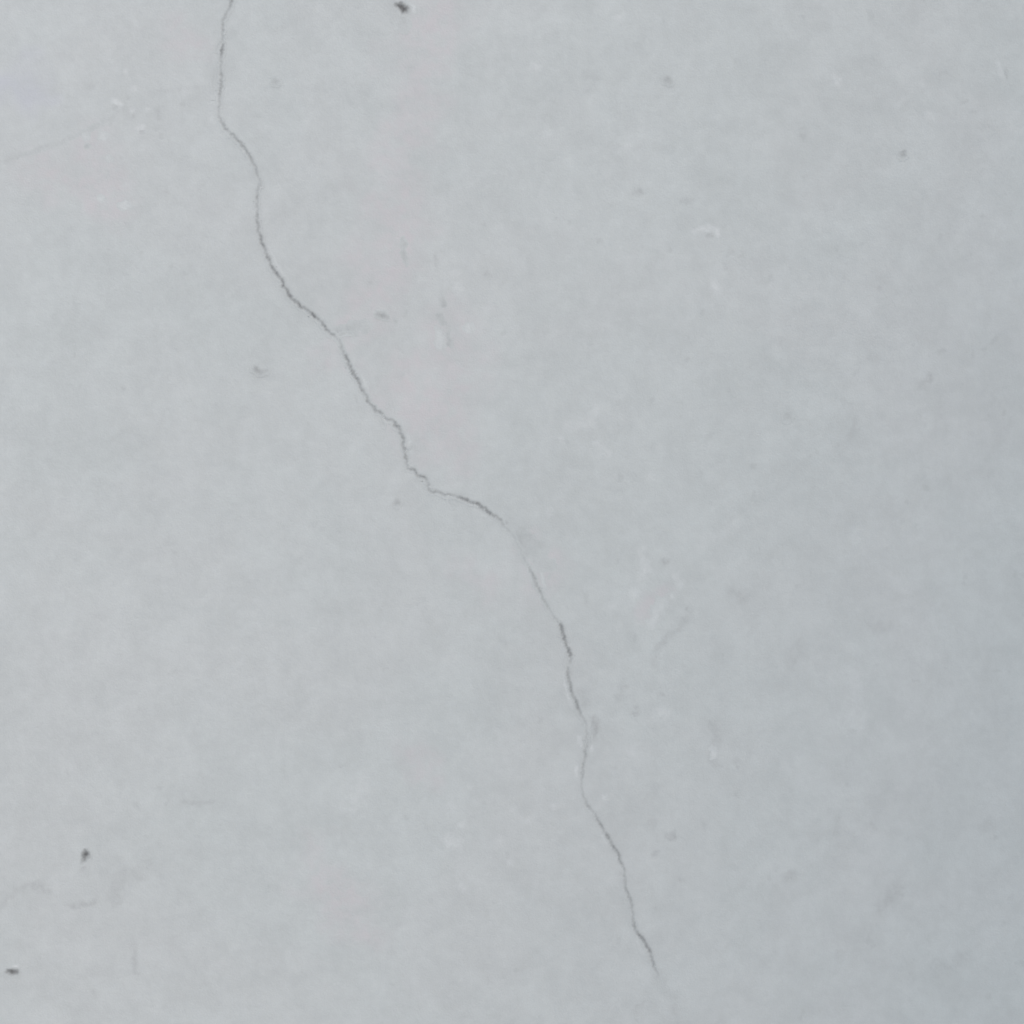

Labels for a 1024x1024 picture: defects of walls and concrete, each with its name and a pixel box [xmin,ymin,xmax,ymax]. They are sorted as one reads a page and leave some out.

crack [206,0,662,982]